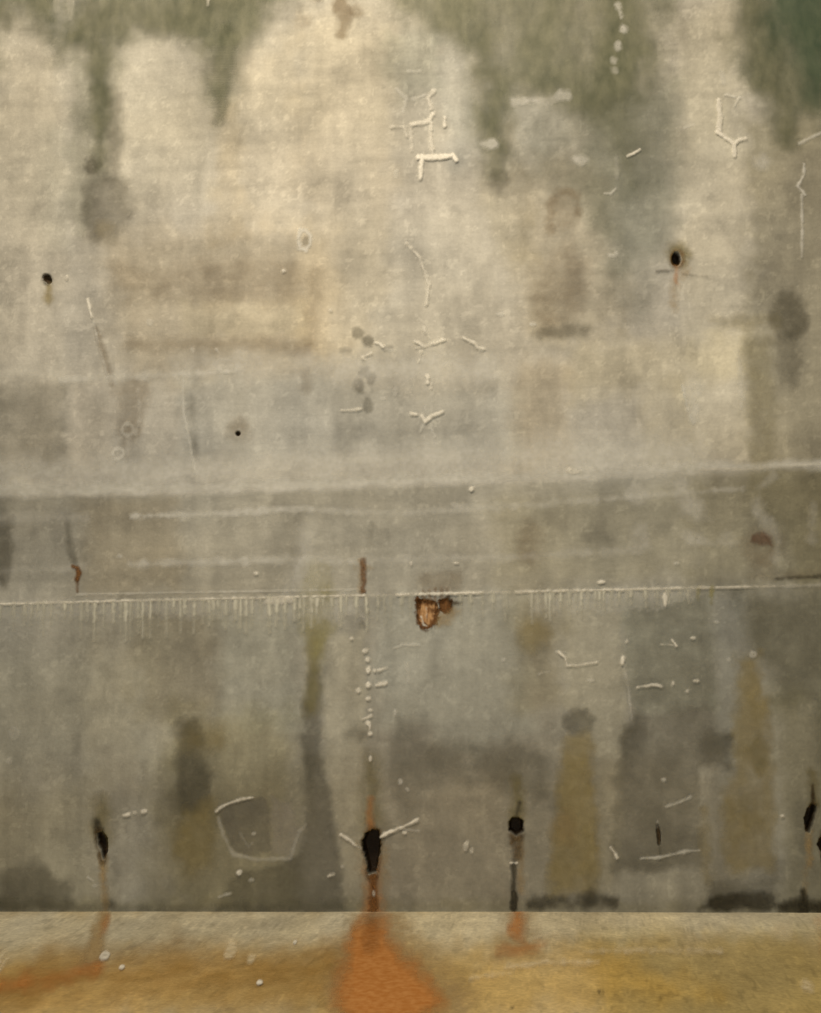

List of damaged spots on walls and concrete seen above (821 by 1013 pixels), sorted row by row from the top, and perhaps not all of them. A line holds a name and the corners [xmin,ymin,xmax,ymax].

rust [333,913,455,1013]